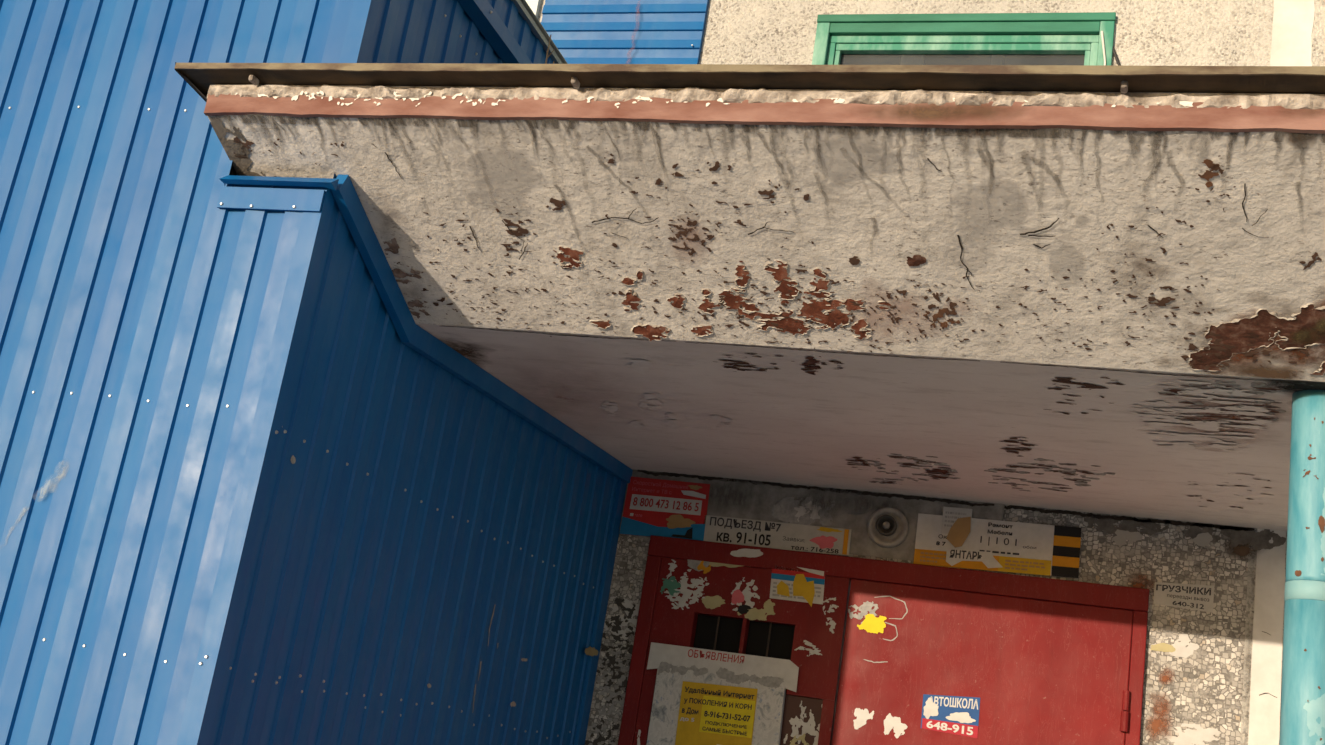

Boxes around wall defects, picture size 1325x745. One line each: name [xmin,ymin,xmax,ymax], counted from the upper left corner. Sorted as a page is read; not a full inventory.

damp [1199,131,1325,164]